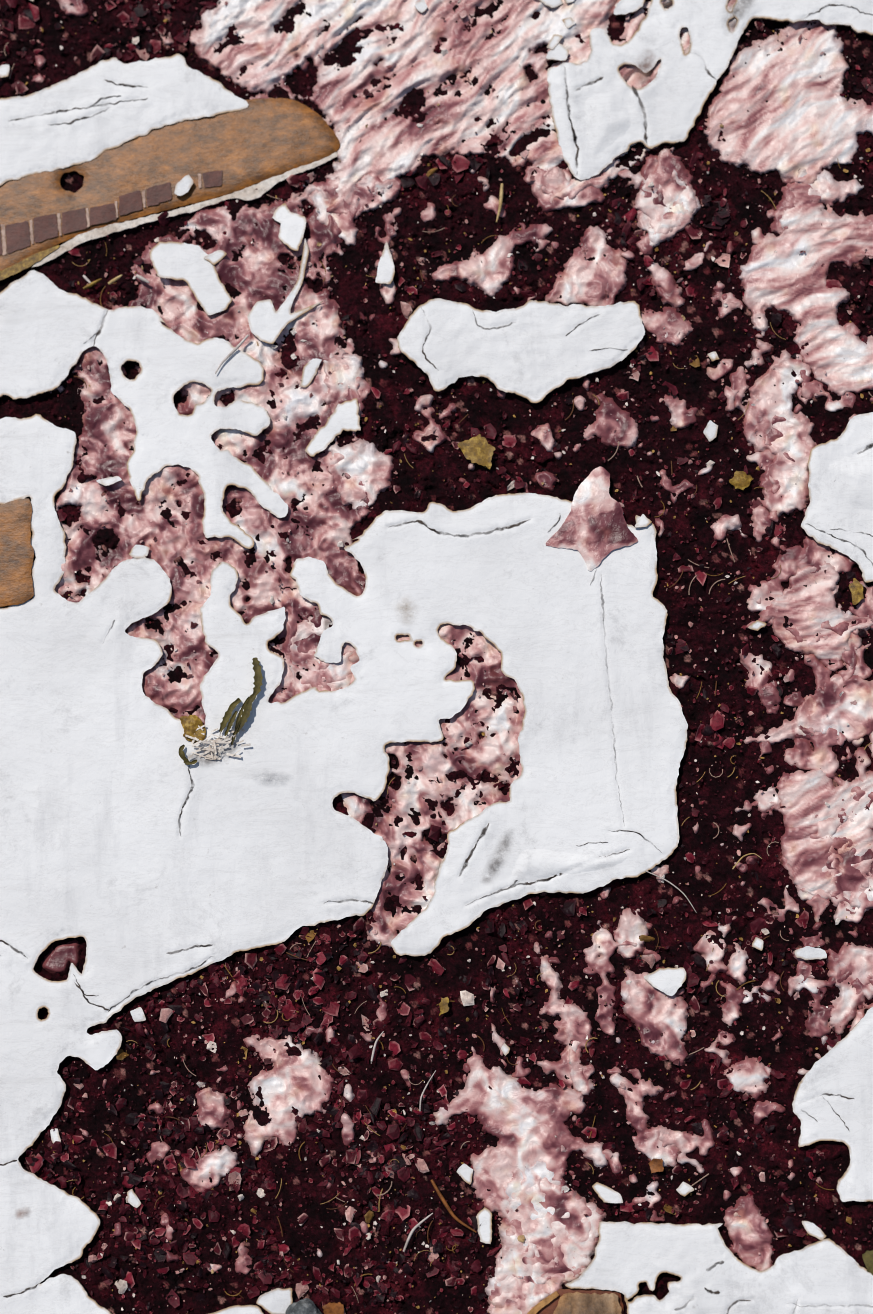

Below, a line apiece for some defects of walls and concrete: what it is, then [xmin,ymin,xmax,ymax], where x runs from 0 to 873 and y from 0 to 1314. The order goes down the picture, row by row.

peeling [0,0,651,216]
peeling [541,142,673,203]
peeling [375,242,395,285]
peeling [0,164,384,725]
peeling [333,624,525,948]
peeling [794,946,827,960]
peeling [644,967,686,996]
peeling [525,1161,561,1220]
peeling [592,1182,623,1203]
peeling [476,1207,492,1244]
peeling [802,1221,826,1240]
peeling [256,1288,293,1314]